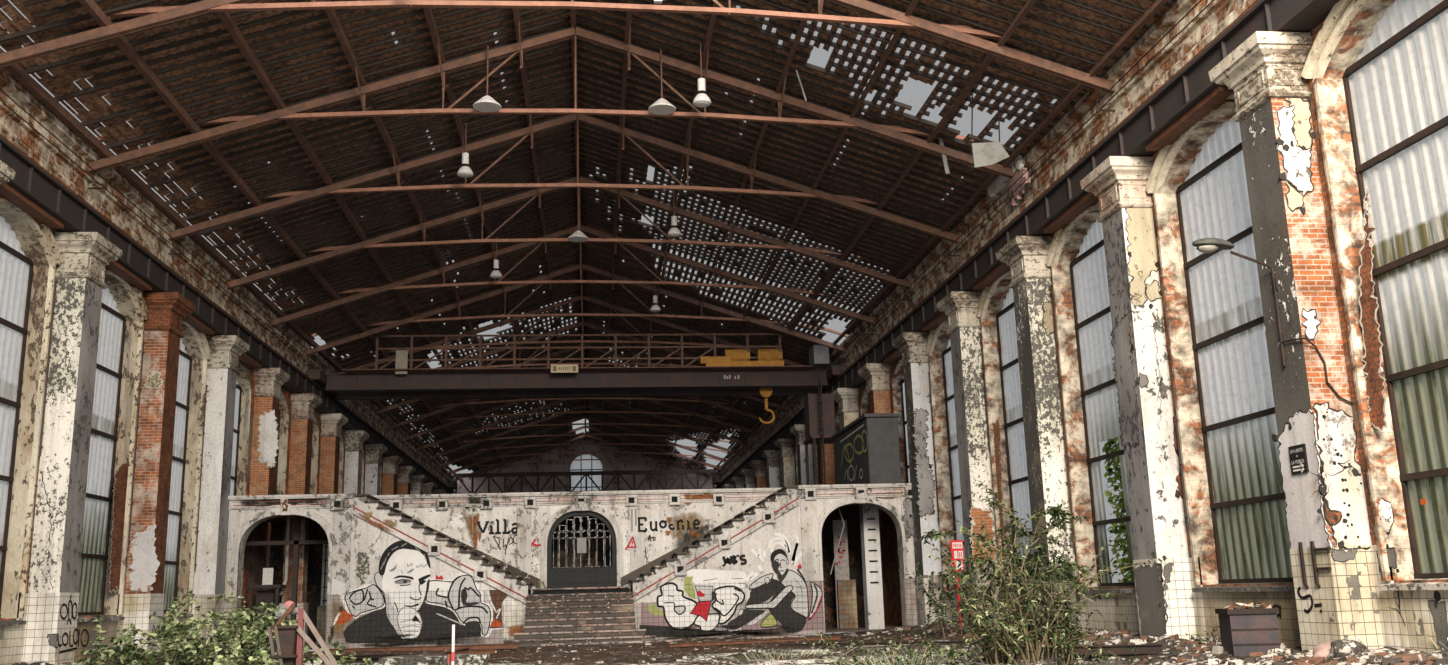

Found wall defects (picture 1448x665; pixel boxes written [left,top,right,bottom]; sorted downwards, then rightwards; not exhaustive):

flaking render [1276,98,1316,215]
peeling [1110,208,1162,449]
flaking render [1272,188,1399,573]
flaking render [108,454,159,593]